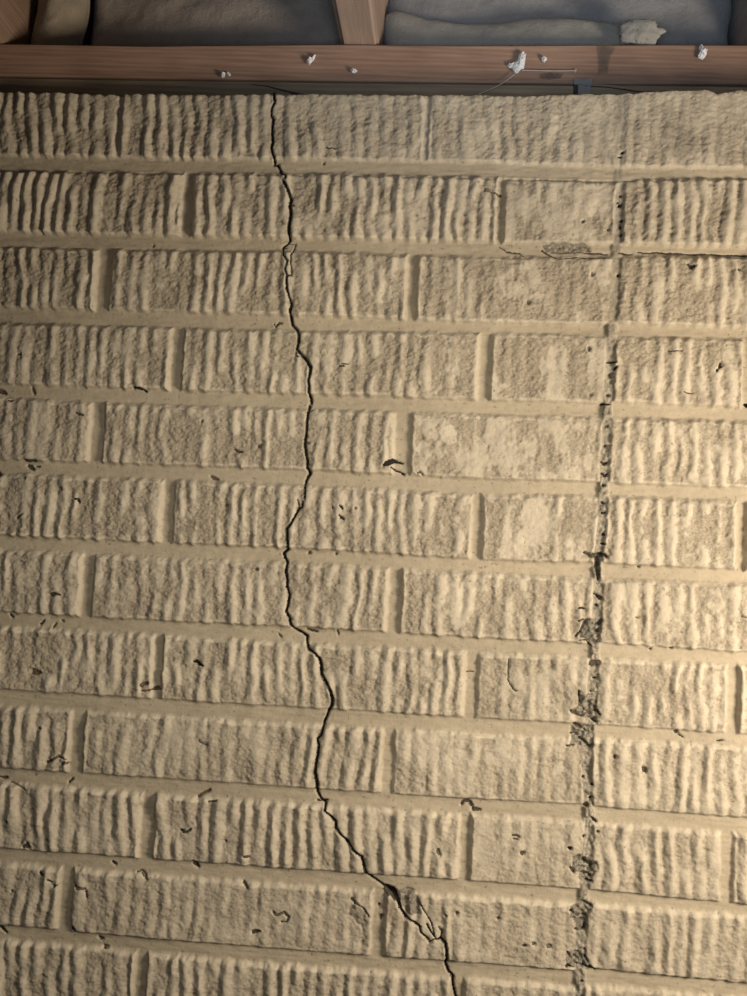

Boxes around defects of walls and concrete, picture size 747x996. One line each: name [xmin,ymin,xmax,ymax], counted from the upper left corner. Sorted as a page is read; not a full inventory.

crack [270,92,457,996]